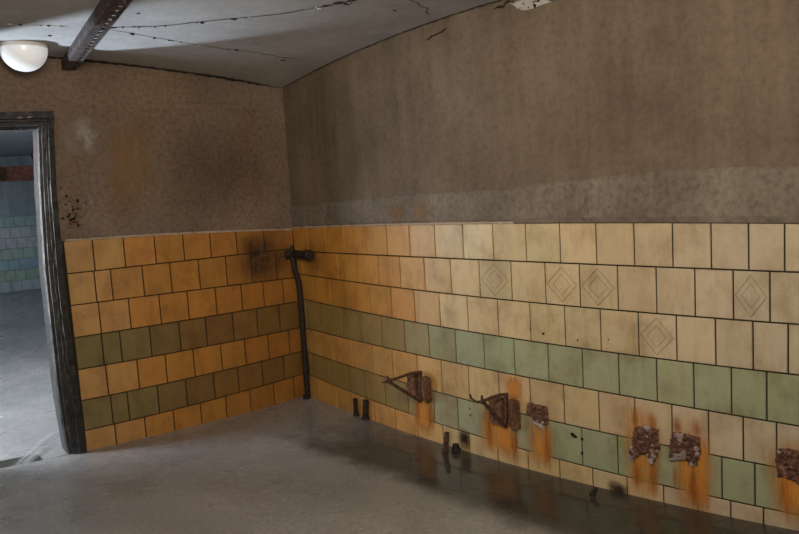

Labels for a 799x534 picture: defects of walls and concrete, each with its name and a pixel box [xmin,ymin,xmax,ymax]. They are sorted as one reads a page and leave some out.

flaking render [510,0,551,10]
crack [47,0,552,88]
rust [483,411,516,454]
rust [631,455,655,489]
rust [674,442,709,507]